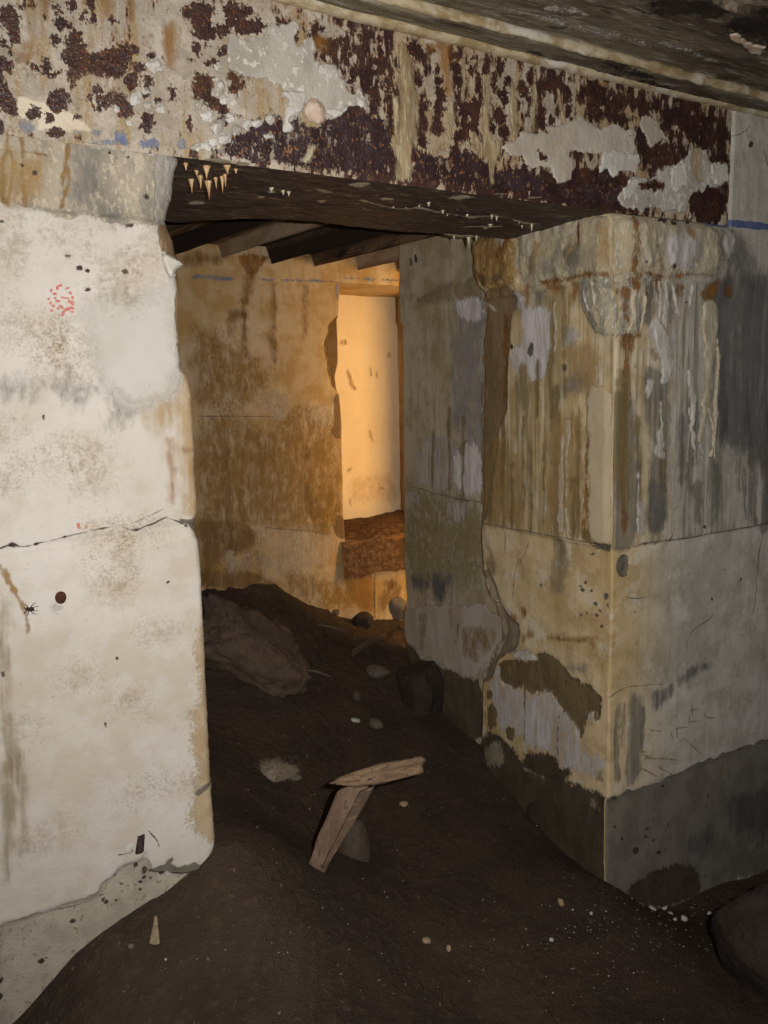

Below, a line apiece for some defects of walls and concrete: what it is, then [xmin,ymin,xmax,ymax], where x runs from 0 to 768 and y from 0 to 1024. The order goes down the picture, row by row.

corrosion [0,0,179,208]
corrosion [180,0,400,173]
peeling [227,20,368,139]
corrosion [406,42,728,245]
peeling [469,115,729,213]
corrosion [630,217,693,301]
water stain [359,197,768,550]
crack [0,517,188,549]
water stain [177,333,340,589]
flaking render [404,569,602,741]
water stain [438,664,768,908]
spalling [0,858,200,1024]